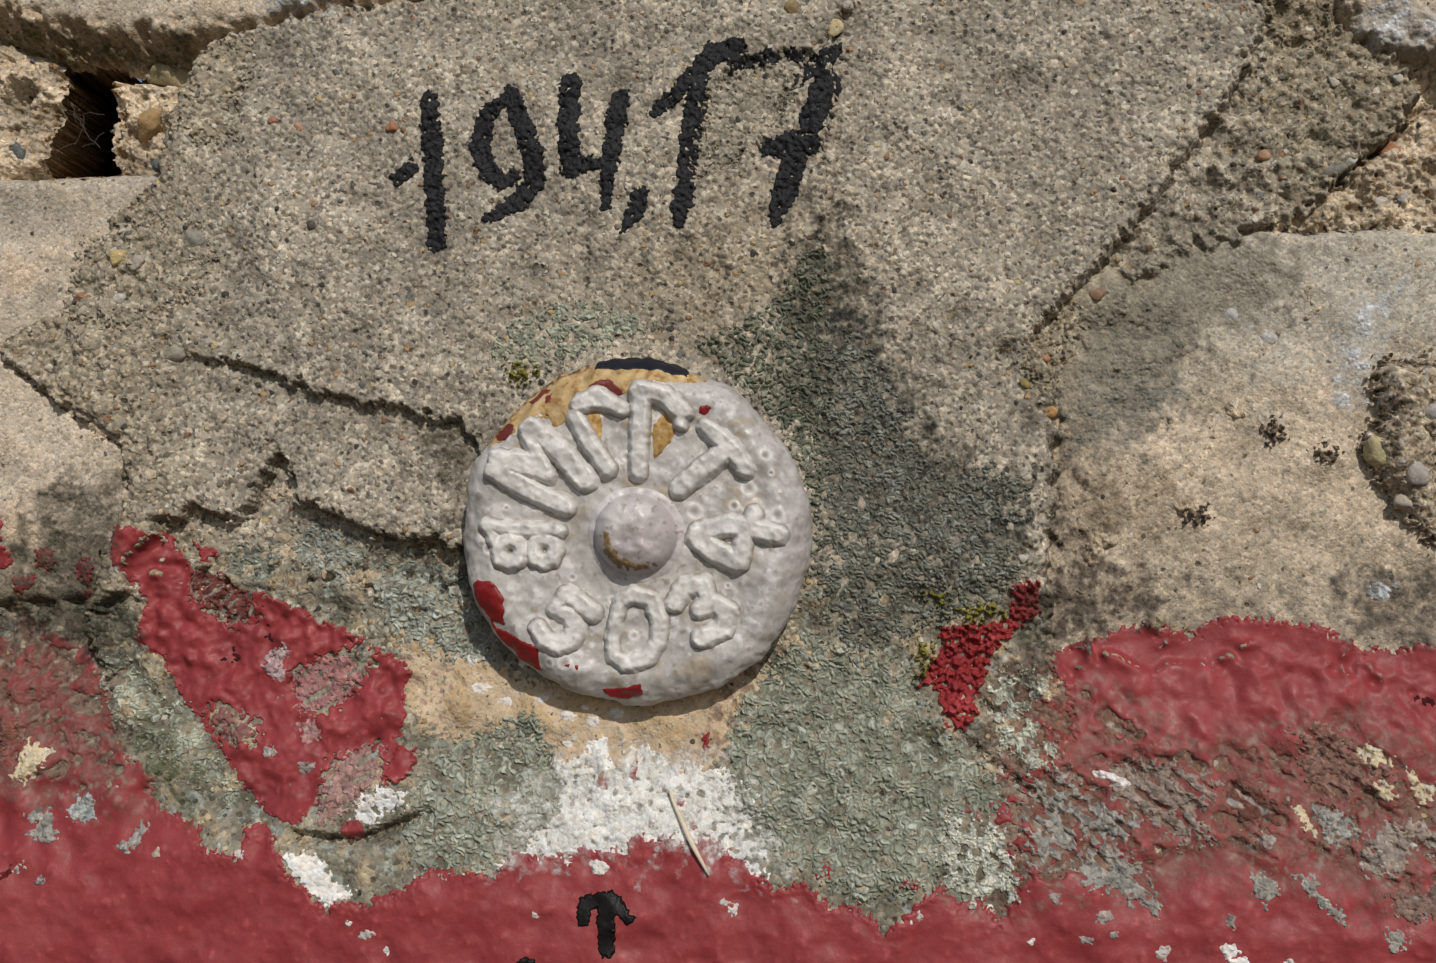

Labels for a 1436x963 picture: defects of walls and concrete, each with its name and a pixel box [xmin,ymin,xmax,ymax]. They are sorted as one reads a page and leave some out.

peeling [0,515,55,596]
peeling [109,523,419,841]
peeling [0,716,56,787]
peeling [22,792,97,844]
peeling [116,819,150,855]
peeling [1013,714,1436,955]
peeling [11,860,45,886]
peeling [1155,945,1171,962]
peeling [1220,913,1250,963]